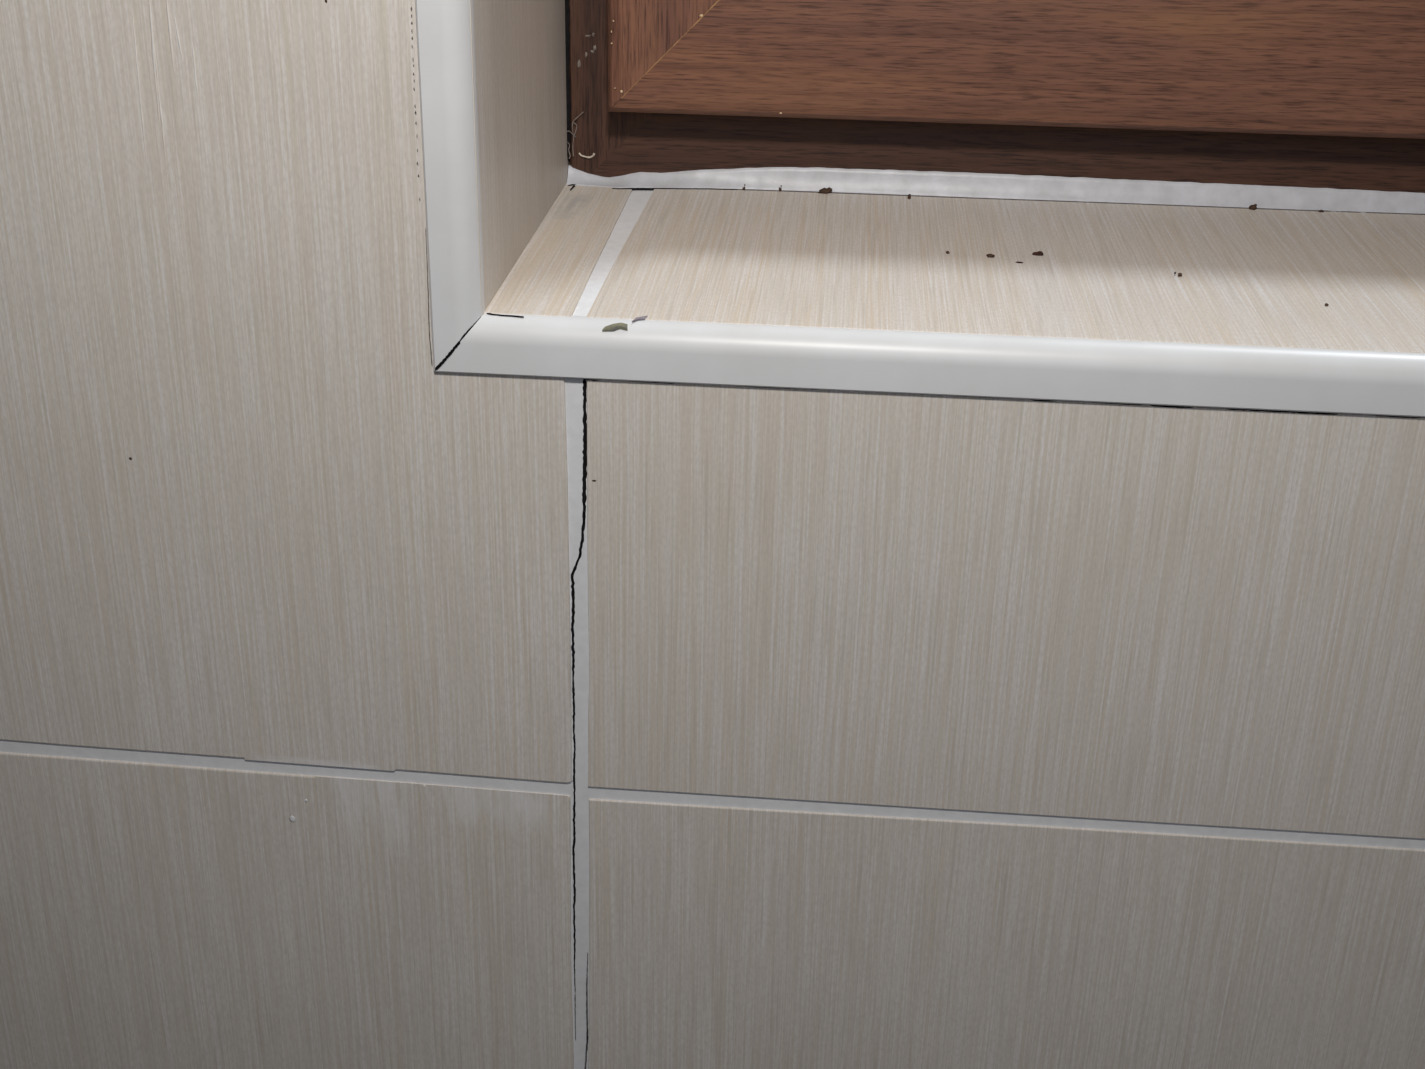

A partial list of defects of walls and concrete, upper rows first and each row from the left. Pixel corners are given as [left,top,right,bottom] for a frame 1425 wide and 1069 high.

crack [571,379,673,1069]